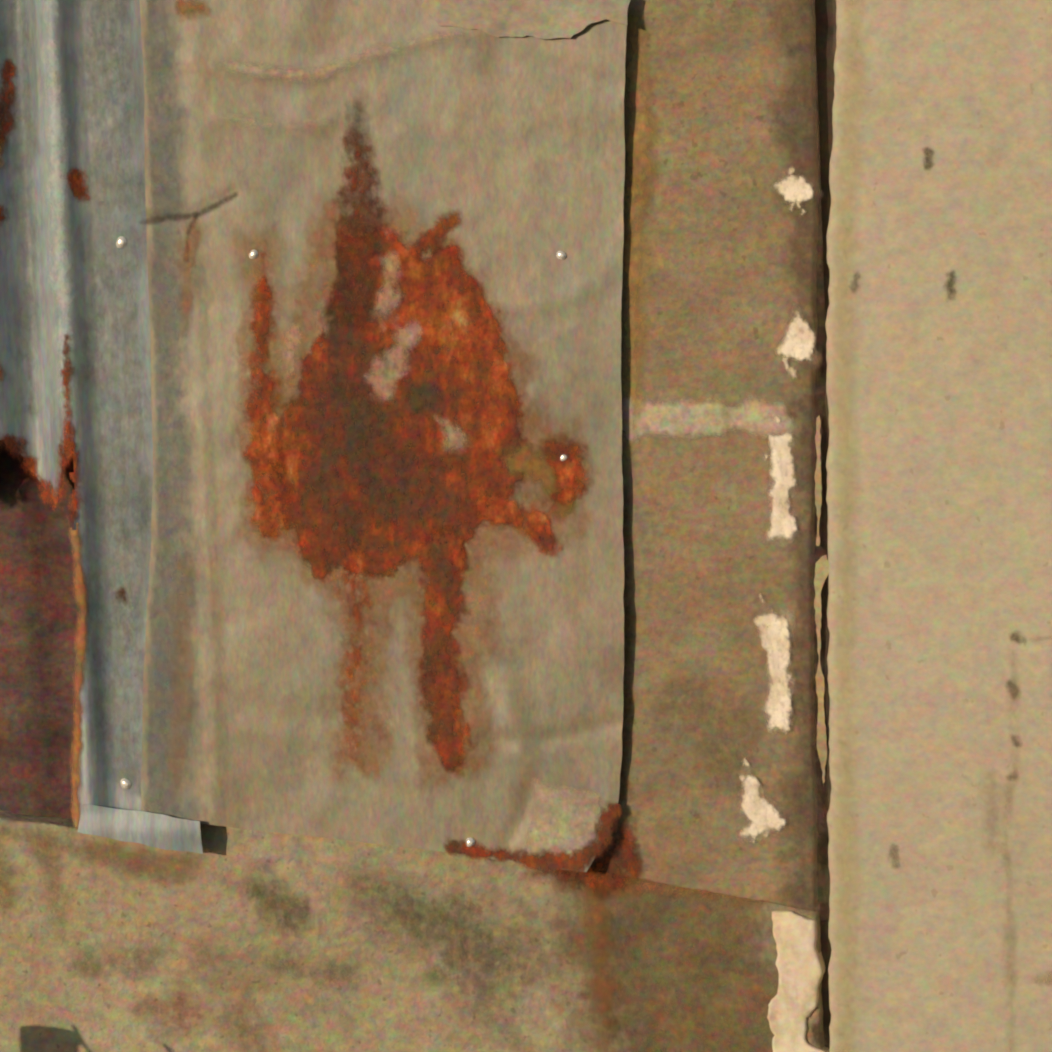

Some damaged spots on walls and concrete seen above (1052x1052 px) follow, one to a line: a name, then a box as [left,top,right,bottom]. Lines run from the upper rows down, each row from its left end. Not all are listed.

corrosion [0,60,16,166]
corrosion [622,12,656,414]
peeling [775,168,814,213]
peeling [778,306,817,377]
corrosion [240,107,586,776]
peeling [765,416,800,546]
corrosion [0,335,87,828]
peeling [755,612,794,732]
corrosion [445,758,708,922]
peeling [738,759,785,841]